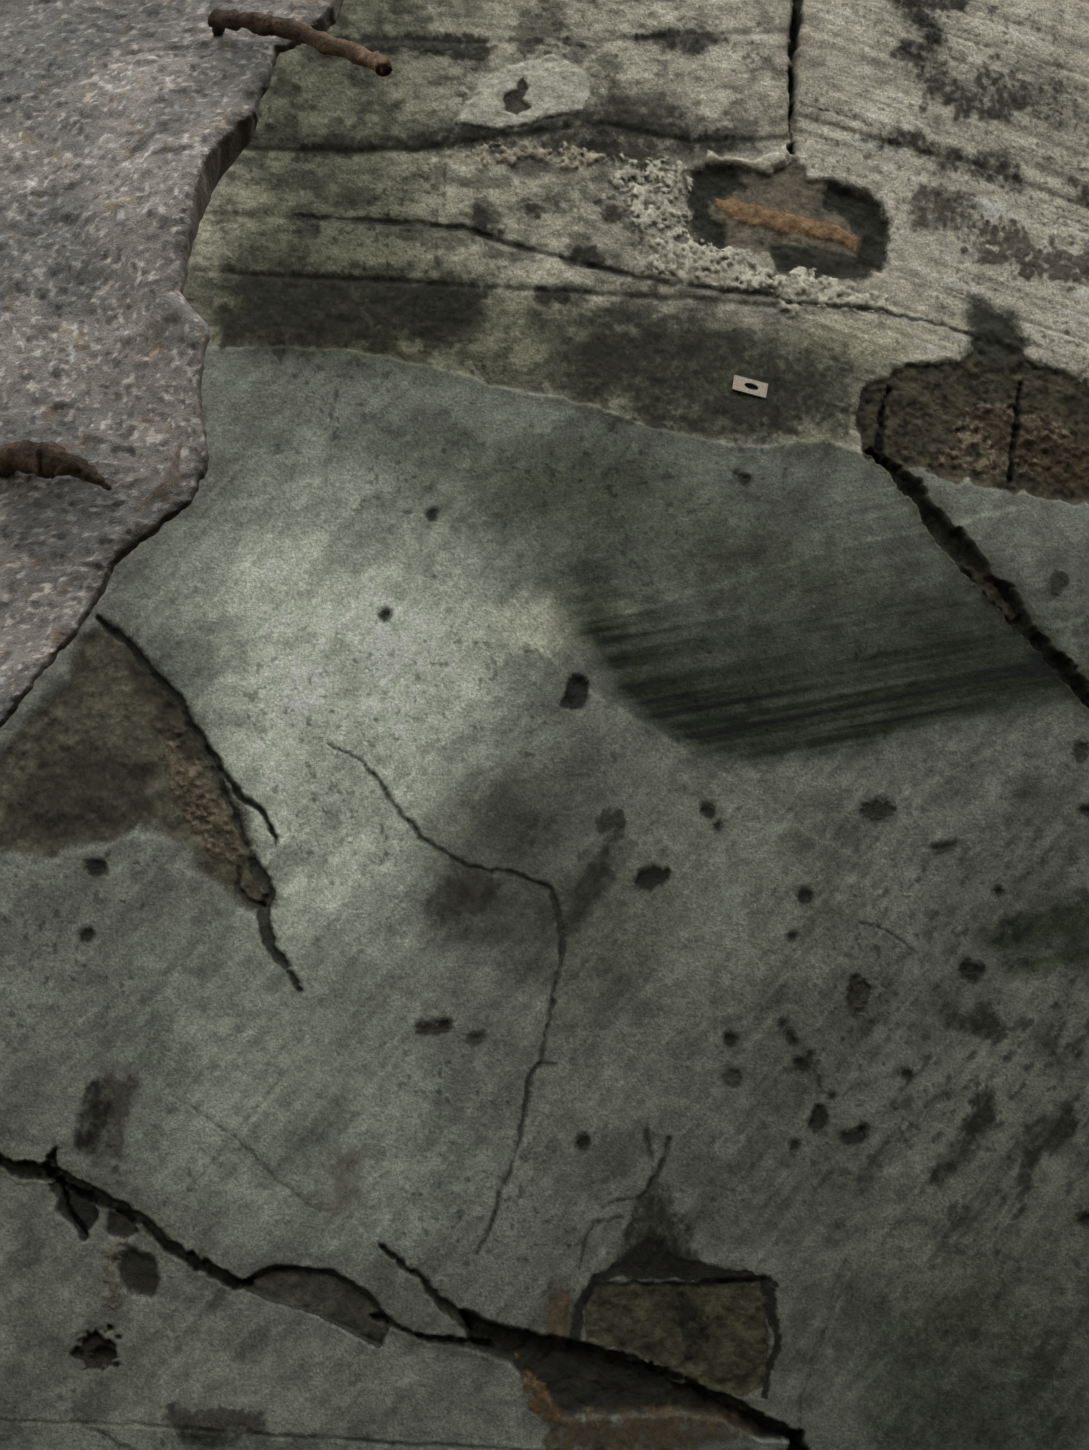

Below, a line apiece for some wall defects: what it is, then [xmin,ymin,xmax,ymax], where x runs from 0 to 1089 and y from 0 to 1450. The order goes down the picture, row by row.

crack [787,0,848,155]
mould [891,0,1068,124]
spalling [457,54,894,316]
mould [861,126,1089,292]
spalling [855,297,1089,505]
crack [865,384,1089,709]
spalling [0,624,277,910]
spalling [79,927,94,941]
crack [329,745,566,1255]
crack [0,1149,253,1290]
crack [371,1245,494,1352]
spalling [461,1239,792,1440]